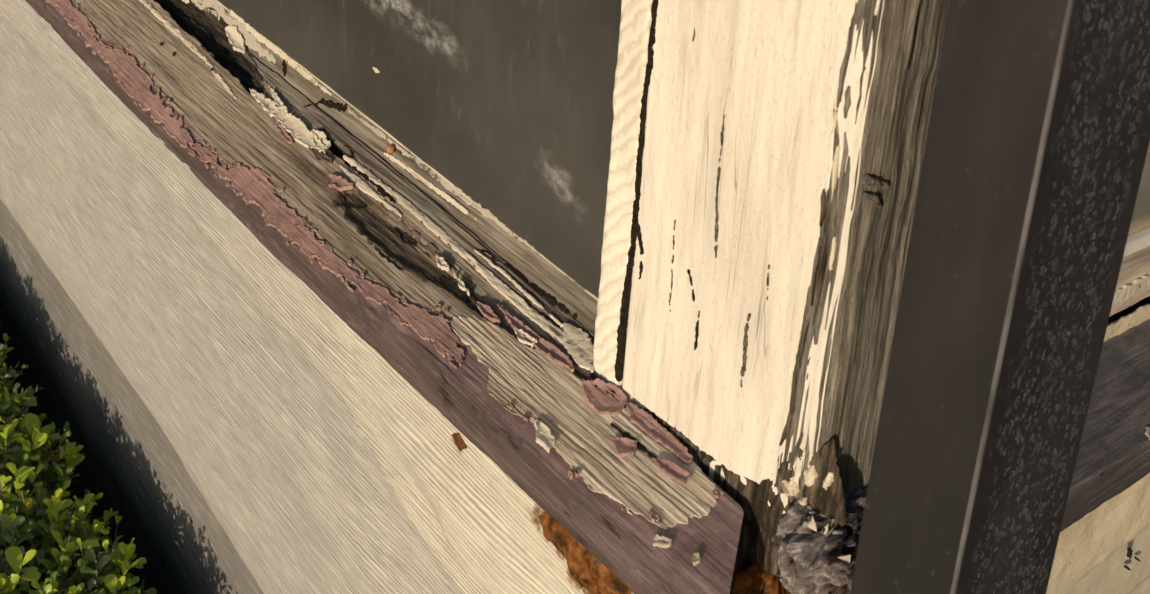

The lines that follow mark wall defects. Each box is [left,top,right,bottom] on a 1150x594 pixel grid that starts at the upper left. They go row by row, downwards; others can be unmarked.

peeling [904,0,920,72]
peeling [46,0,723,548]
peeling [774,0,889,536]
peeling [1111,274,1150,309]
rust [532,507,632,594]
rust [732,563,792,594]